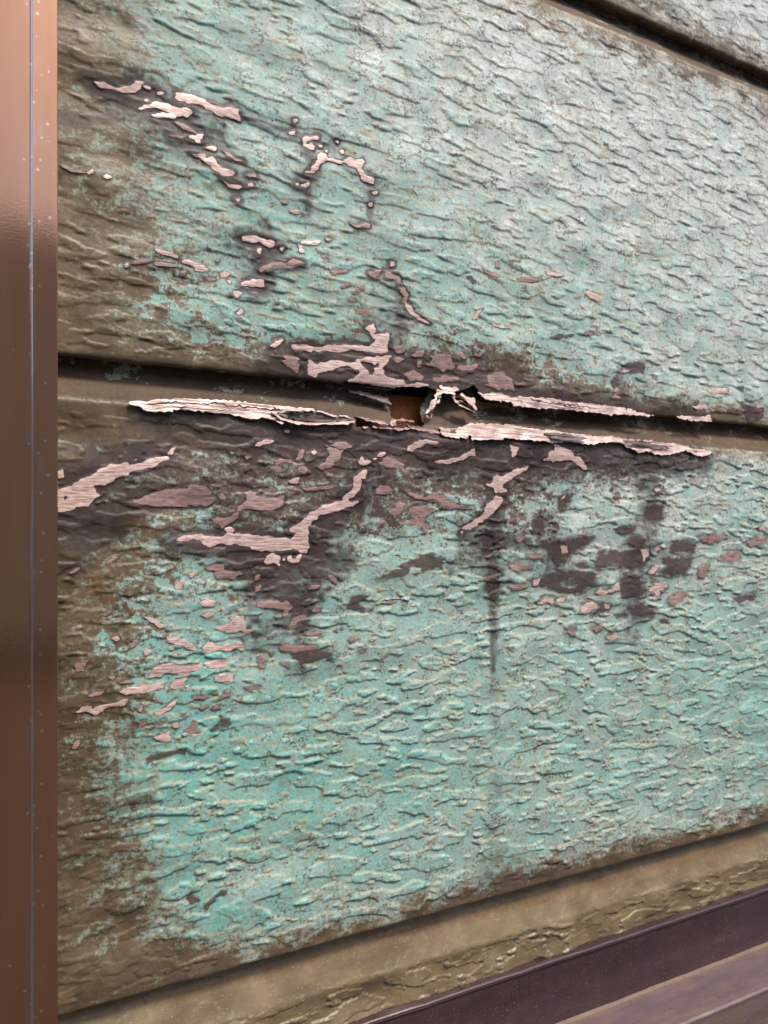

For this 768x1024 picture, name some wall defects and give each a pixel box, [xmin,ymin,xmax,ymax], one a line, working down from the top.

peeling [91,78,260,207]
peeling [286,116,381,232]
peeling [124,230,331,315]
peeling [267,259,654,417]
peeling [58,441,180,512]
peeling [129,398,389,433]
leakage [58,410,712,671]
peeling [128,423,712,627]
peeling [507,477,767,623]
peeling [676,386,764,423]
peeling [74,598,255,762]
peeling [257,627,376,668]